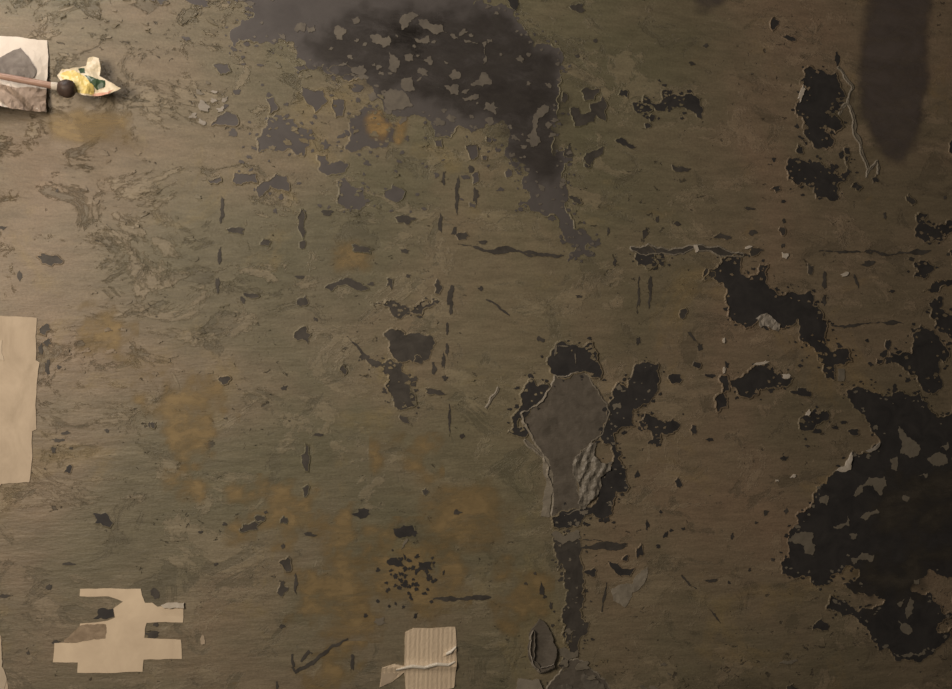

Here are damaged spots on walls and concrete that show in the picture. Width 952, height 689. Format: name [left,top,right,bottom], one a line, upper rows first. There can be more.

flaking render [188,0,610,262]
water stain [318,13,558,175]
peeling [618,79,704,129]
peeling [770,52,880,203]
water stain [861,0,930,160]
spalling [36,252,64,267]
spalling [324,276,374,292]
spalling [393,525,418,538]
spalling [376,549,445,619]
peeling [358,277,465,439]
spalling [507,336,713,689]
peeling [688,193,952,673]